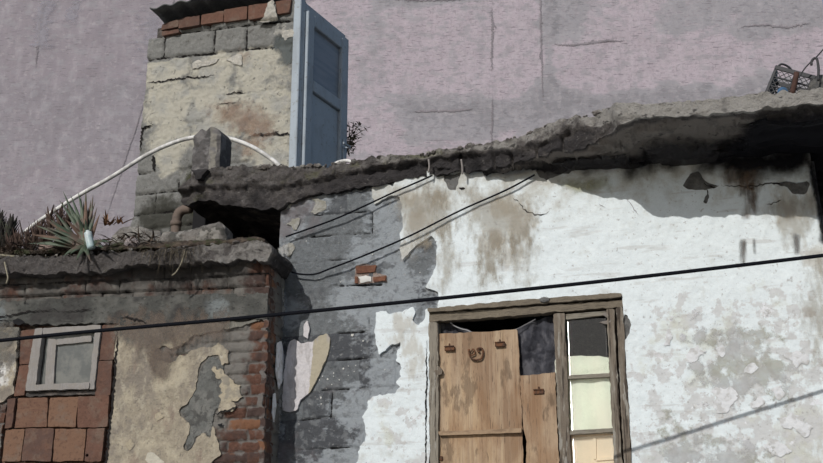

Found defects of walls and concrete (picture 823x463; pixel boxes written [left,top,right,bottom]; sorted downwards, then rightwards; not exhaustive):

spalling [536,169,564,180]
spalling [683,171,717,203]
crack [704,182,787,205]
crack [0,308,91,321]
flaking render [159,188,439,463]
flaking render [0,396,13,463]